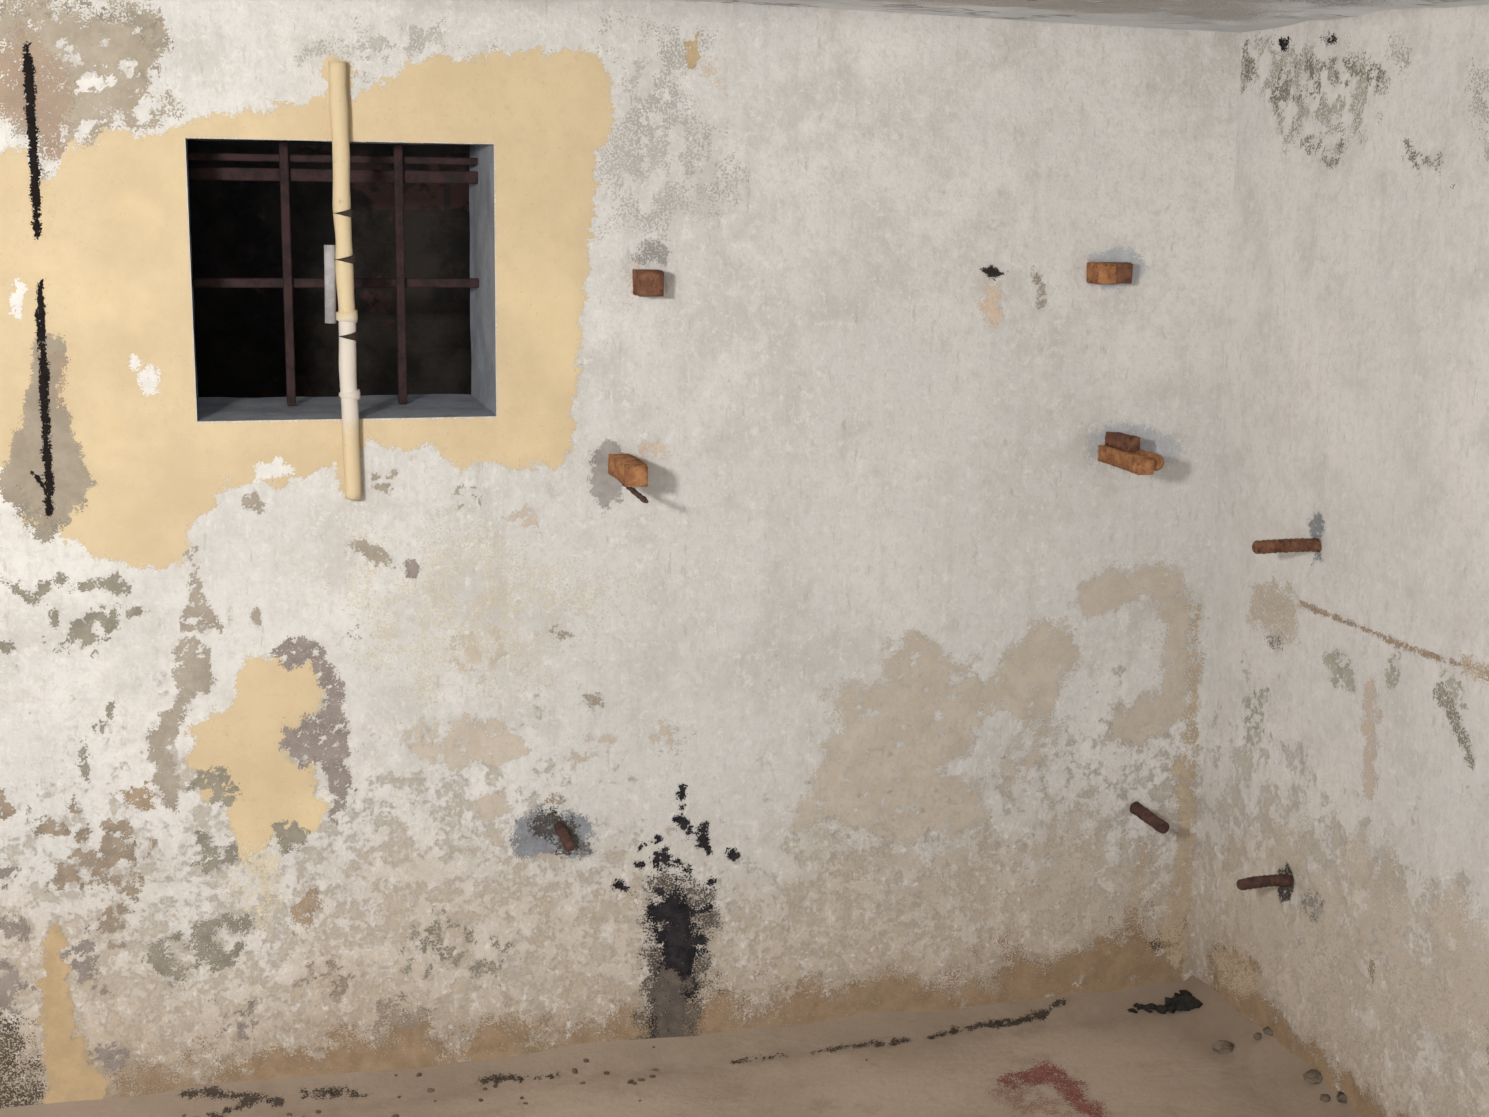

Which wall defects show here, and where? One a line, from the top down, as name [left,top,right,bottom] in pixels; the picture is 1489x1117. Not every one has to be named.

crack [22,41,43,240]
crack [30,278,56,518]
peeling [0,45,672,1104]
corrosion [1121,602,1210,979]
leakage [100,812,1489,1117]